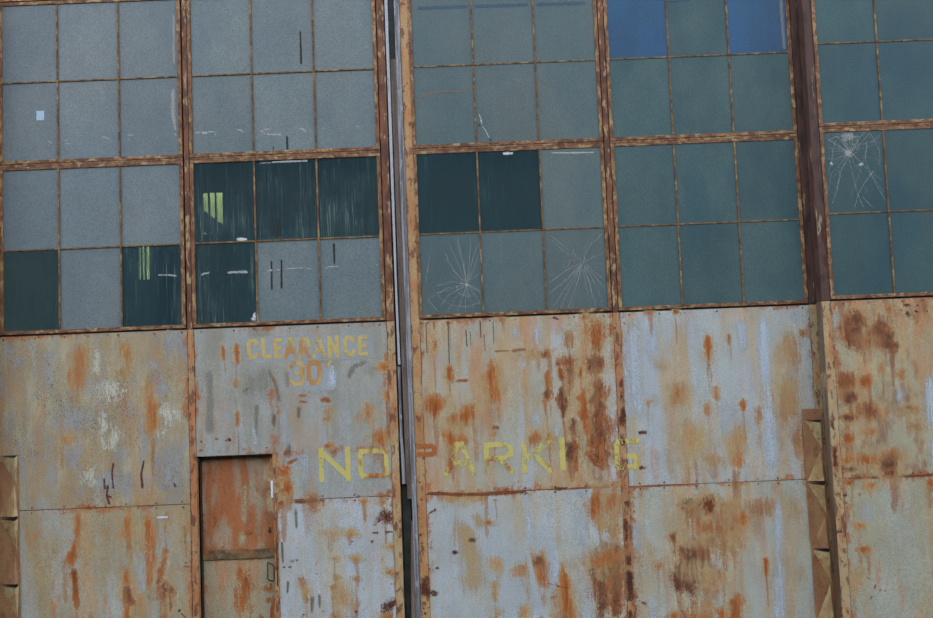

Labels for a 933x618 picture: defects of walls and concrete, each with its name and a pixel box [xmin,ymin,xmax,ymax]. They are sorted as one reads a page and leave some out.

rust [701,334,714,363]
rust [417,312,627,467]
rust [830,303,933,500]
rust [671,420,747,469]
rust [359,489,393,526]
rust [420,487,527,514]
rust [62,512,86,610]
rust [115,508,186,618]
rust [487,478,751,618]
rust [232,566,276,618]
rust [380,597,396,618]
rust [420,564,439,615]